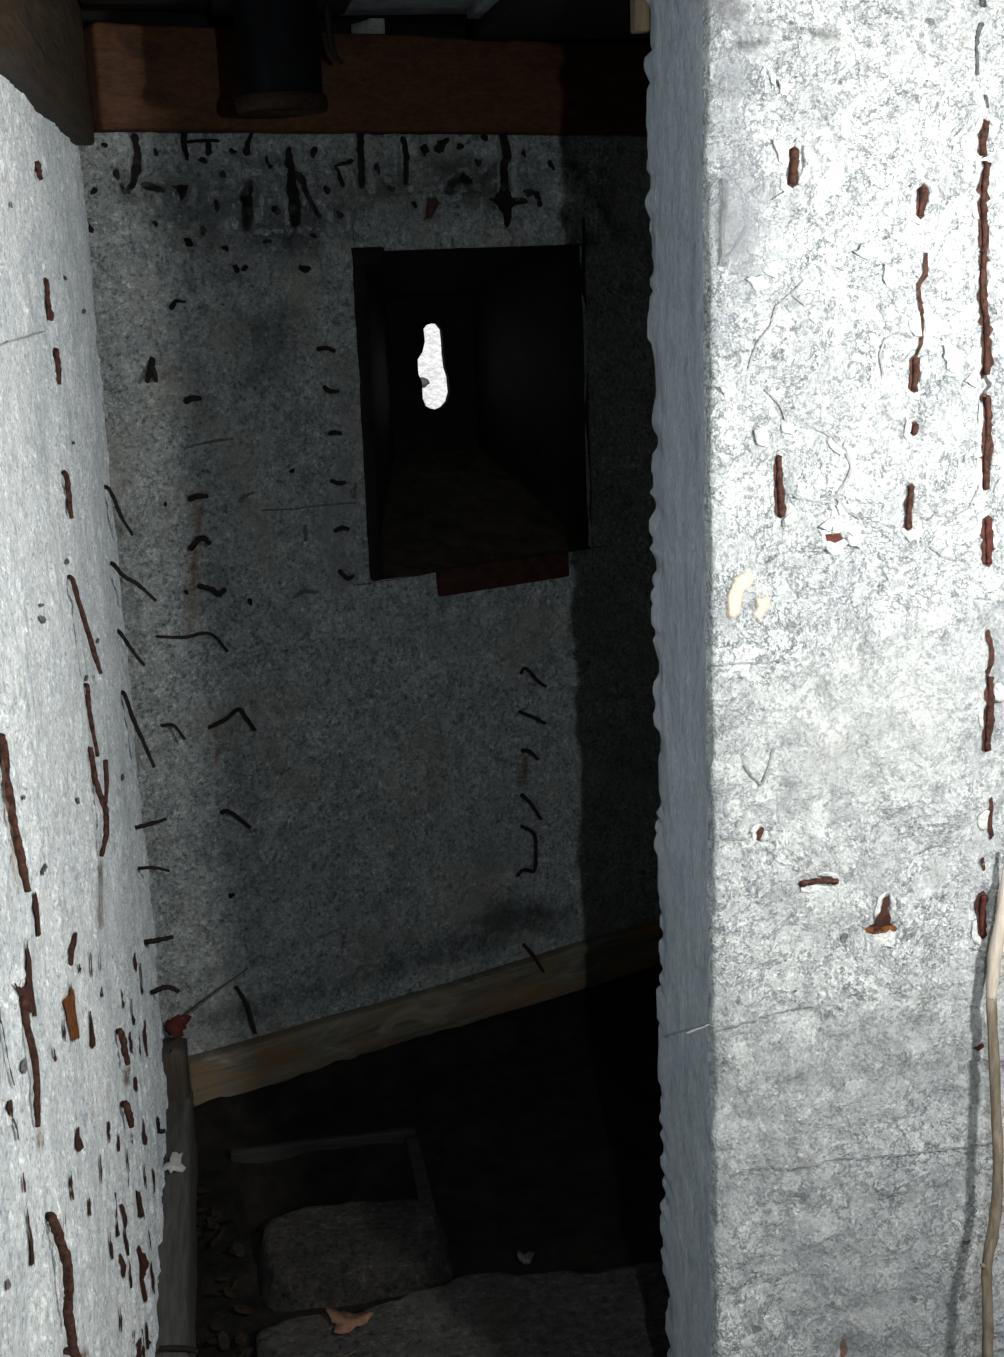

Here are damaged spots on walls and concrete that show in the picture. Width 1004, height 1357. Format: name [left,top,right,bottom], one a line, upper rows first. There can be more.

peeling [728,571,770,620]
spalling [0,733,104,1146]